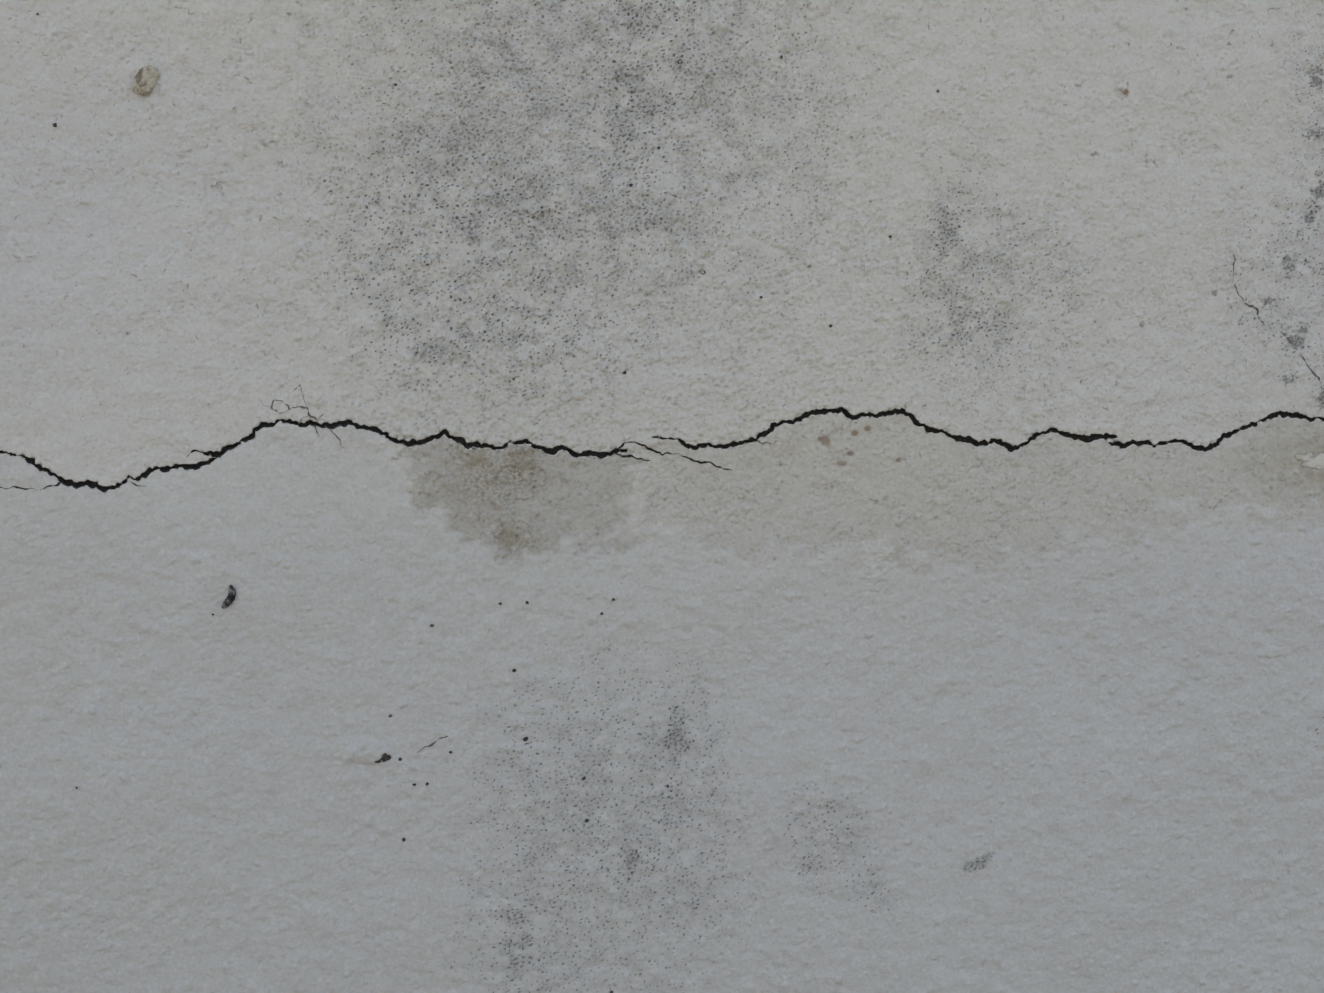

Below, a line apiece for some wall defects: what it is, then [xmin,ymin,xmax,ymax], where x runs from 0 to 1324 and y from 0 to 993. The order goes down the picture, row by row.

crack [0,255,1324,492]